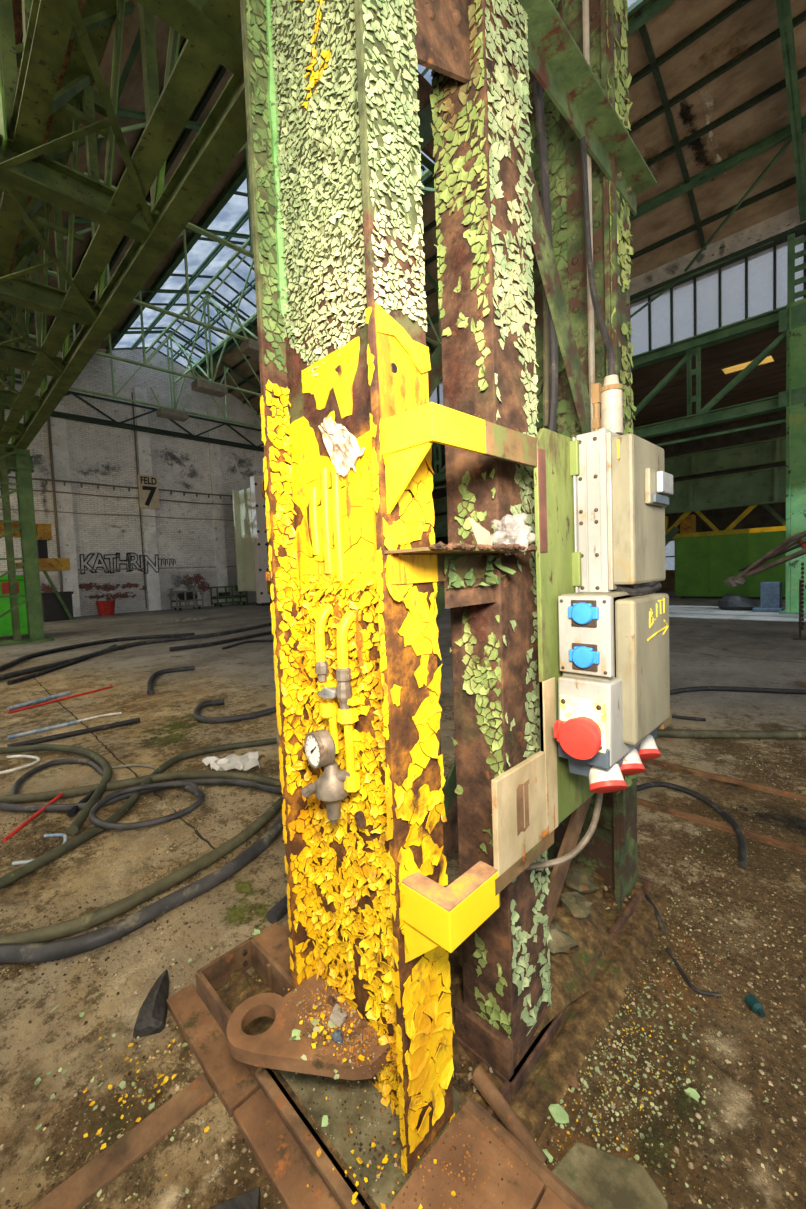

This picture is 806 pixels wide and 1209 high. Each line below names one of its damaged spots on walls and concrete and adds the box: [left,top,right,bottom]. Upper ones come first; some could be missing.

peeling [606,0,632,133]
leakage [670,90,730,181]
peeling [609,180,637,435]
peeling [246,0,571,1205]
rust [463,603,492,668]
rust [517,779,530,858]